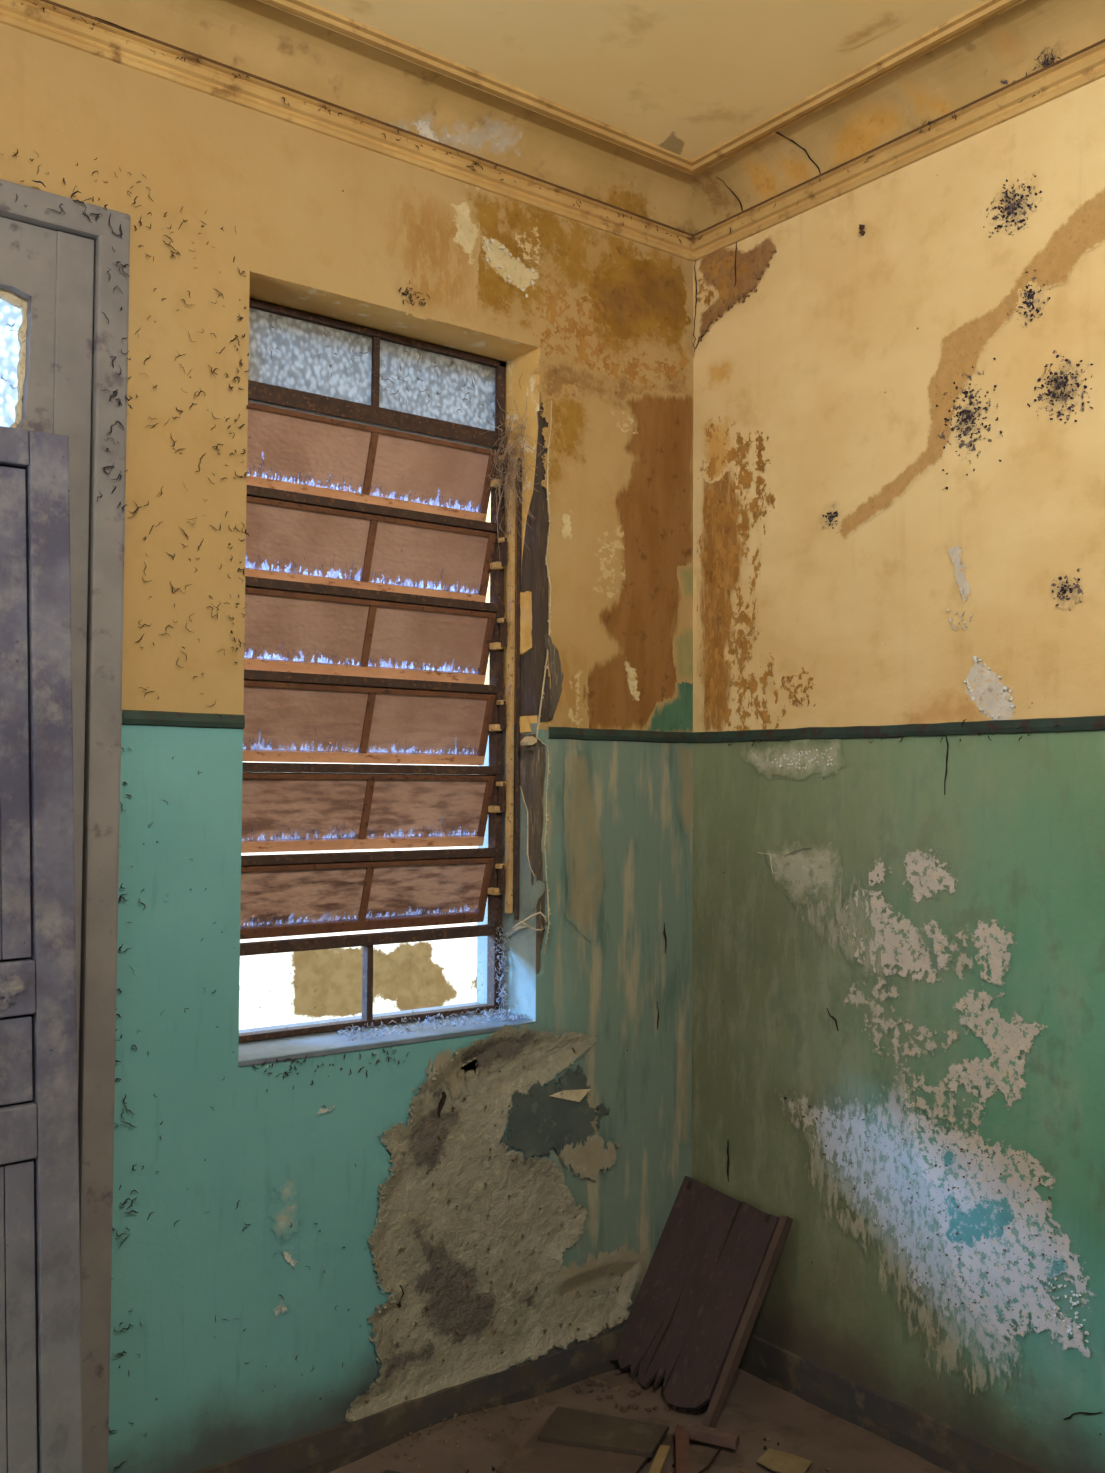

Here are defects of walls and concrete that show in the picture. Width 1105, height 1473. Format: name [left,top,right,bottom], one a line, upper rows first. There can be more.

crack [775,131,821,174]
leakage [692,0,1030,224]
peeling [449,185,541,298]
leakage [387,183,693,413]
crack [717,177,743,285]
peeling [694,234,778,342]
leakage [838,186,1105,541]
leakage [677,562,693,601]
leakage [672,622,693,684]
peeling [964,655,1017,720]
peeling [756,836,1097,1399]
flaking render [345,1024,648,1422]